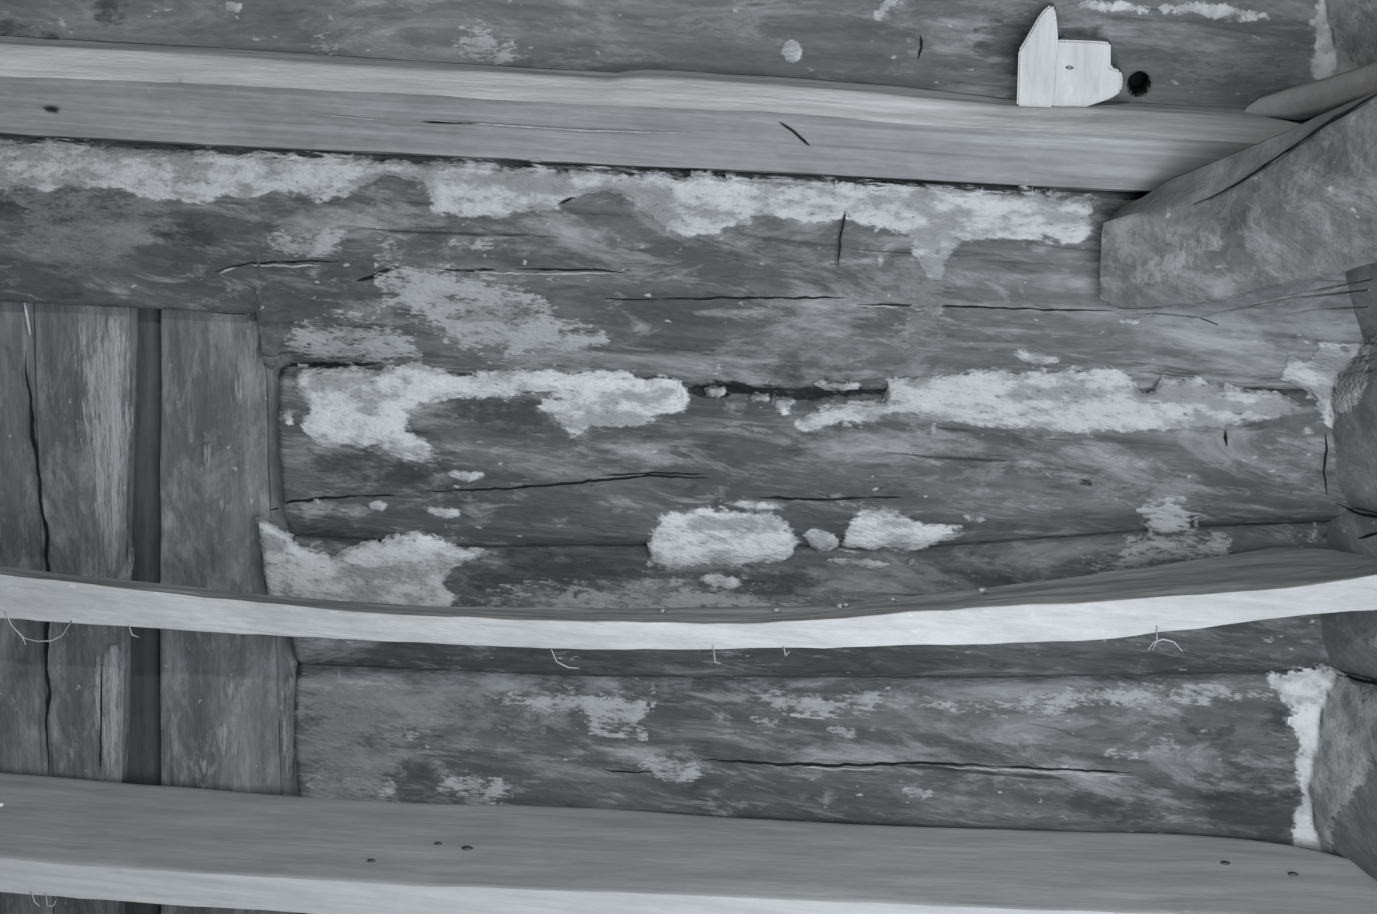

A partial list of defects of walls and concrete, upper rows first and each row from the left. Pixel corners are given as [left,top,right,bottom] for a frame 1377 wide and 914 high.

crack [25,363,50,572]
crack [428,472,698,492]
crack [760,494,901,502]
crack [43,621,51,772]